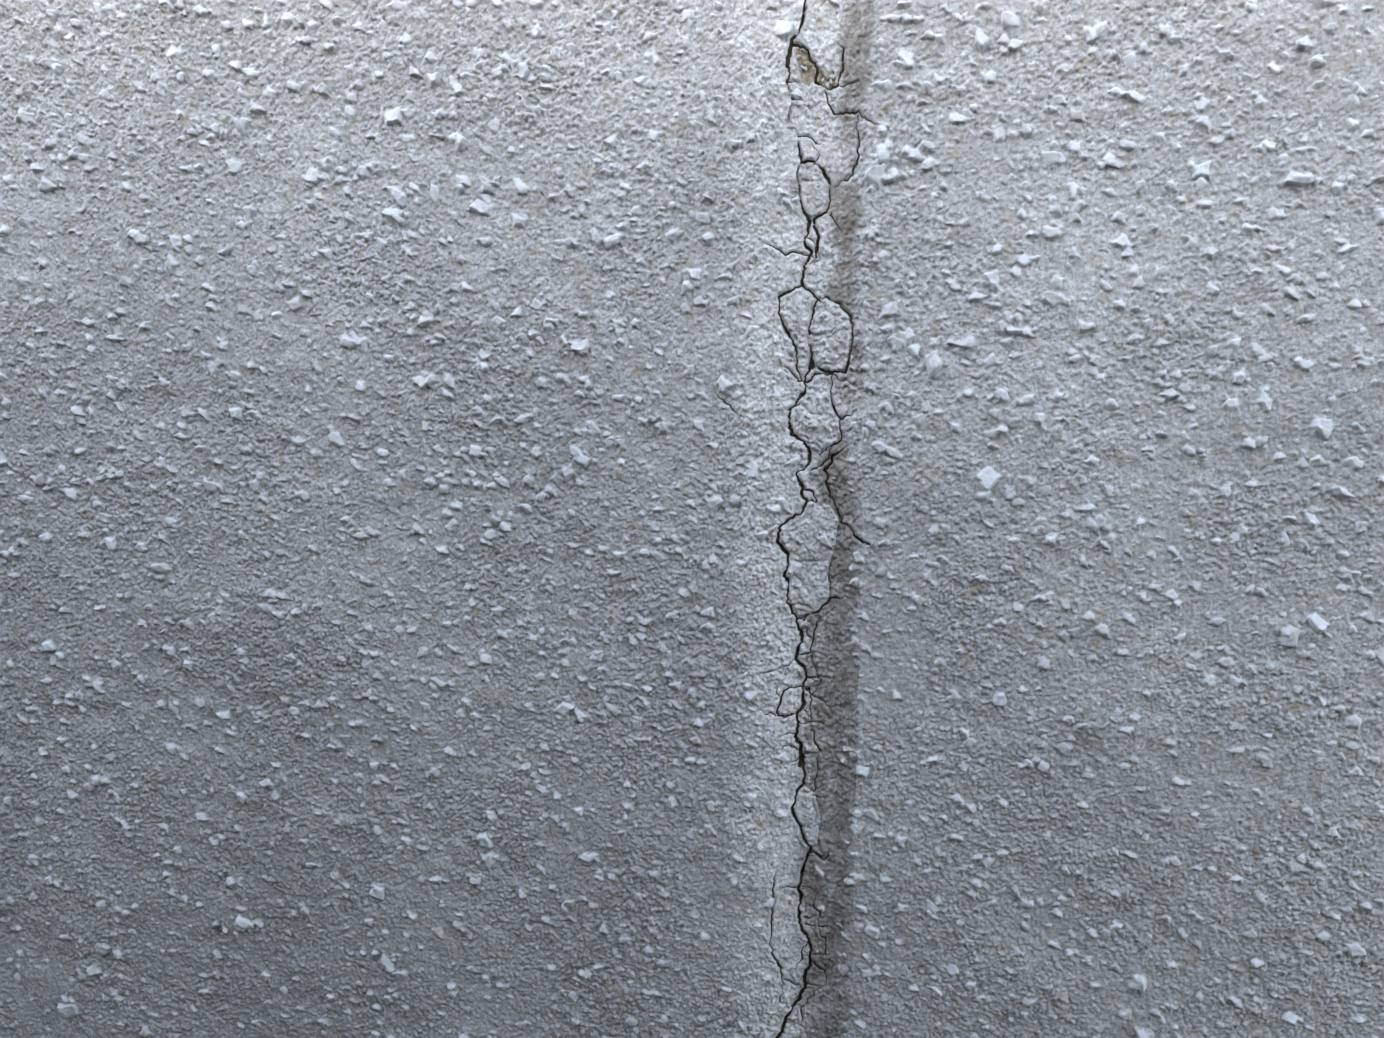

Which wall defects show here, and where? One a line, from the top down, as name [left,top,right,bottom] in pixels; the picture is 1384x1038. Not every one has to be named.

crack [762,0,879,1038]